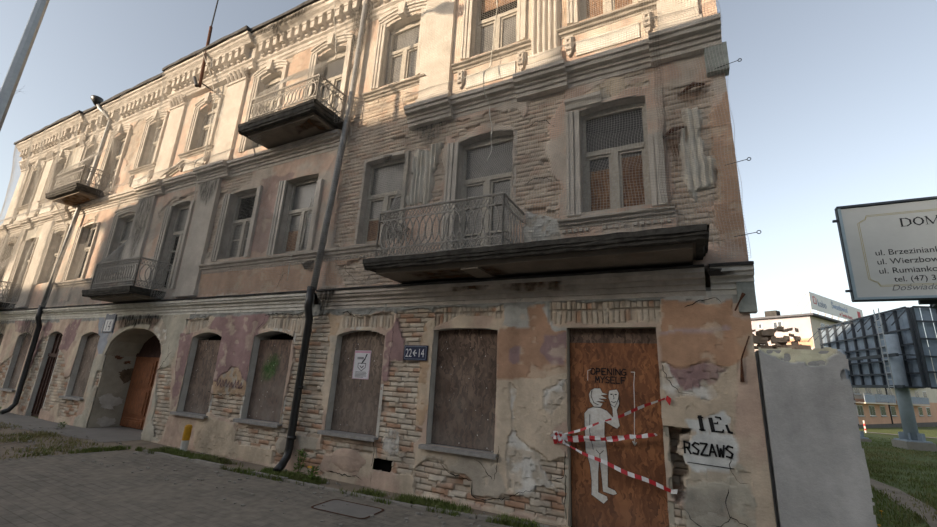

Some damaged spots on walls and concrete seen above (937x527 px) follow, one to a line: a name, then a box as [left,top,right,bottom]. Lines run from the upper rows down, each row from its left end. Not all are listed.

spalling [333,91,564,247]
spalling [663,81,722,246]
spalling [19,337,50,414]
spalling [42,351,79,418]
spalling [210,313,569,521]
spalling [344,305,504,345]
peeling [661,361,728,401]
peeling [668,411,739,527]